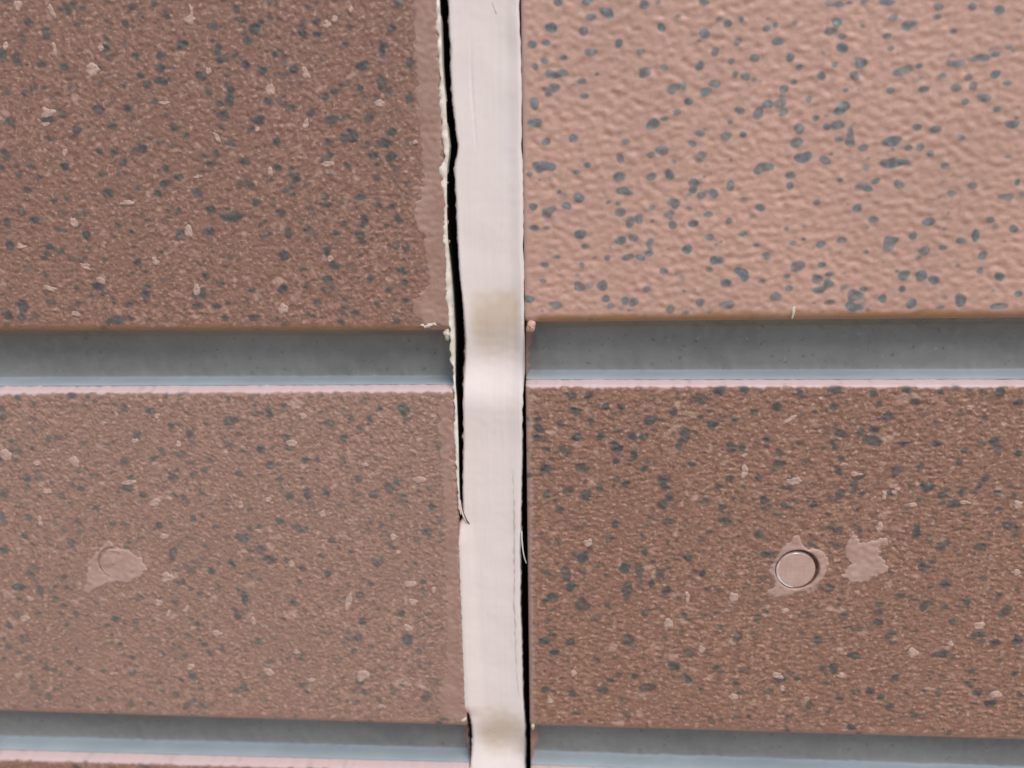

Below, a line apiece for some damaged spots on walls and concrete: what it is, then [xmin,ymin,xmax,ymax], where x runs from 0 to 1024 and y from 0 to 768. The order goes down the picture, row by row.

crack [436,0,470,524]
crack [516,0,524,75]
crack [521,292,531,768]